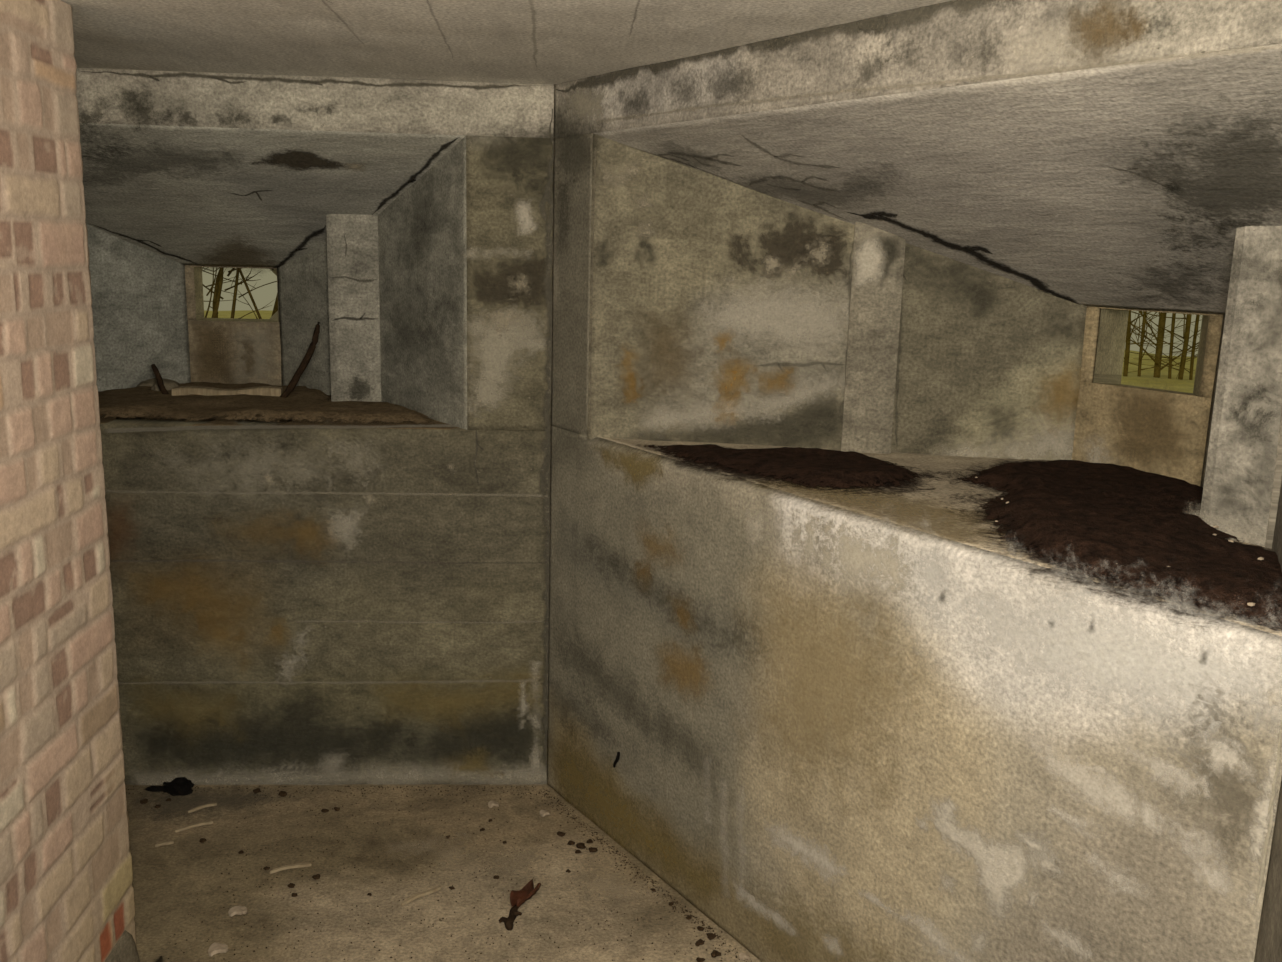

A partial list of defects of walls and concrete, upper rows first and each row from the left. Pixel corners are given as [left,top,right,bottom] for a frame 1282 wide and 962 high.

damp [1073,2,1144,55]
damp [1136,127,1282,234]
crack [847,212,1080,305]
crack [81,0,995,772]